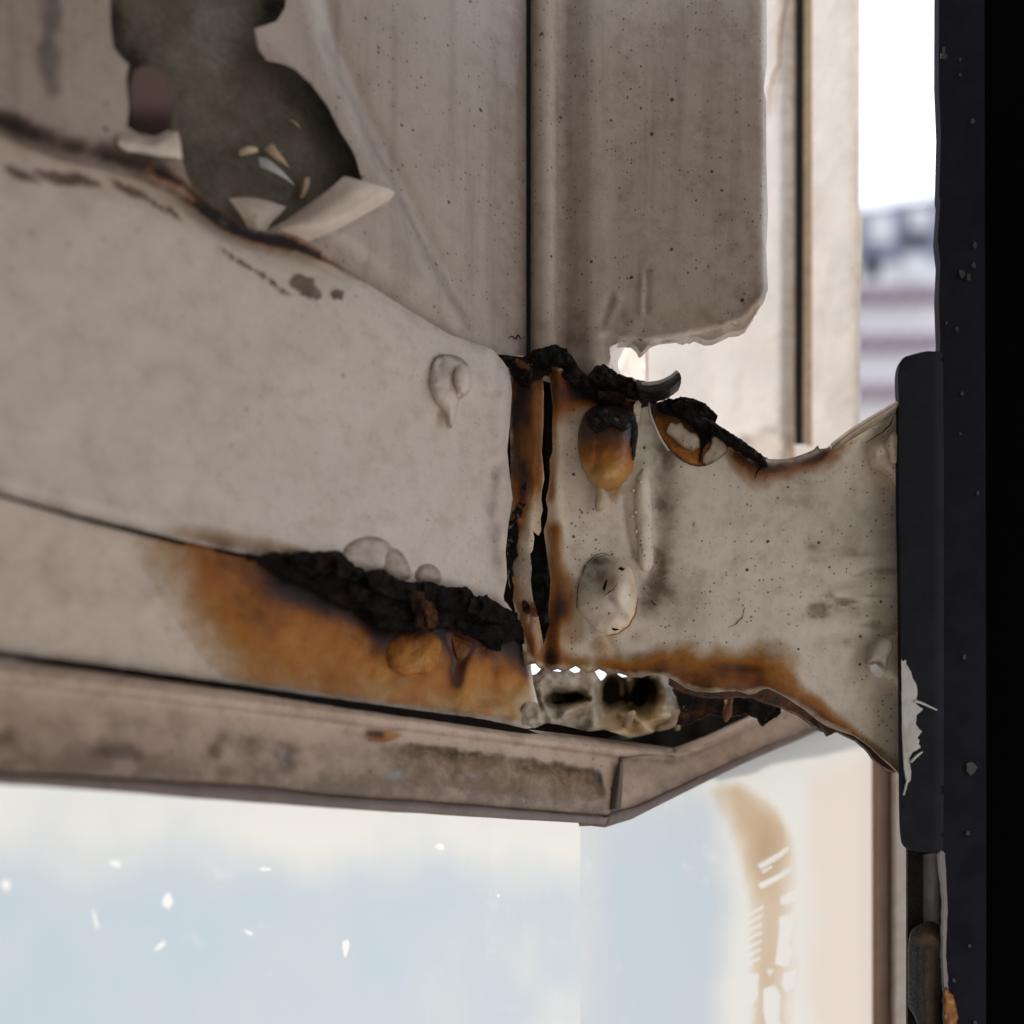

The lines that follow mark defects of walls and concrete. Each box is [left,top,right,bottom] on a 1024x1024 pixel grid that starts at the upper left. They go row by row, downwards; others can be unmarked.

peeling [5,165,101,186]
peeling [110,0,394,242]
peeling [223,249,343,300]
crack [504,381,553,644]
rust [501,344,845,532]
peeling [634,400,728,467]
rust [159,523,896,773]